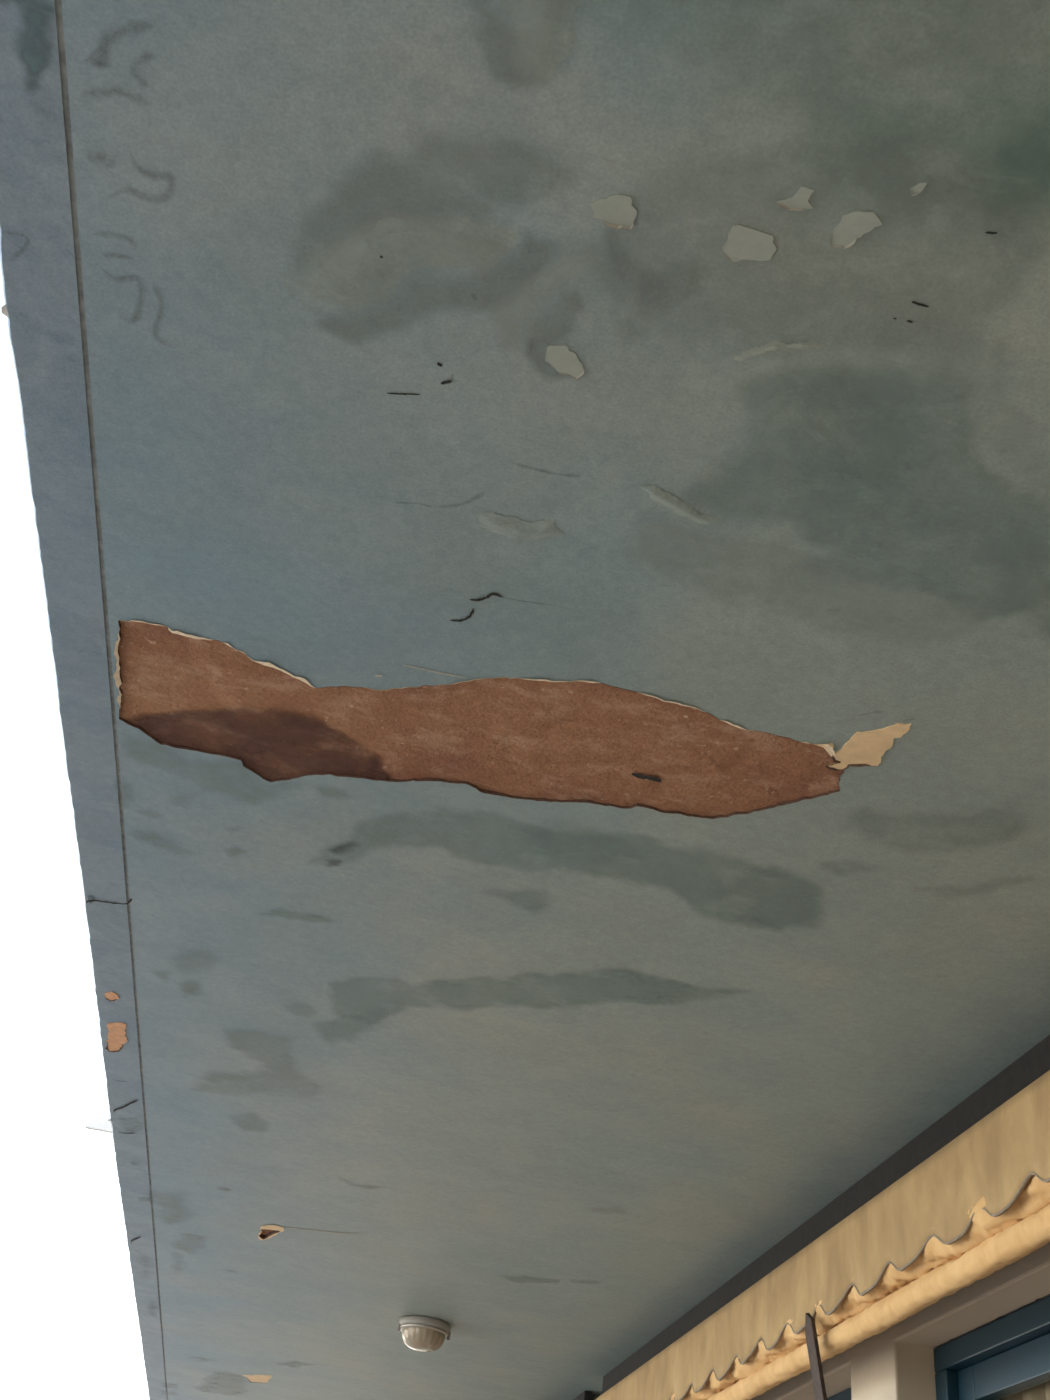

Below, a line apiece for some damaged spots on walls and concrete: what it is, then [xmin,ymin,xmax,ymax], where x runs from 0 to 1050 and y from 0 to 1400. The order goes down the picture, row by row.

leakage [20,5,52,88]
peeling [591,194,637,229]
peeling [776,186,815,211]
peeling [722,224,777,263]
peeling [830,211,882,249]
peeling [545,344,584,379]
spalling [114,620,912,819]
peeling [105,1022,129,1052]
spalling [258,1225,284,1240]
peeling [243,1375,272,1383]